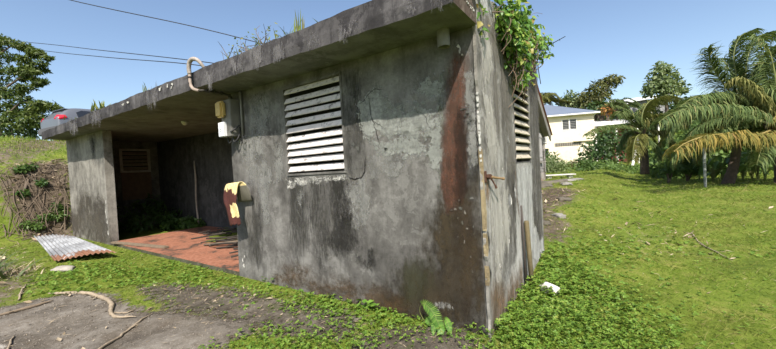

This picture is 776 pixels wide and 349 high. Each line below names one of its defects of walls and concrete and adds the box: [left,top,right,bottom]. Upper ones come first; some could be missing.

water stain [273,42,284,62]
crack [359,88,382,140]
peeling [345,77,445,229]
water stain [380,83,486,335]
corrosion [442,53,467,209]
water stain [480,7,543,259]